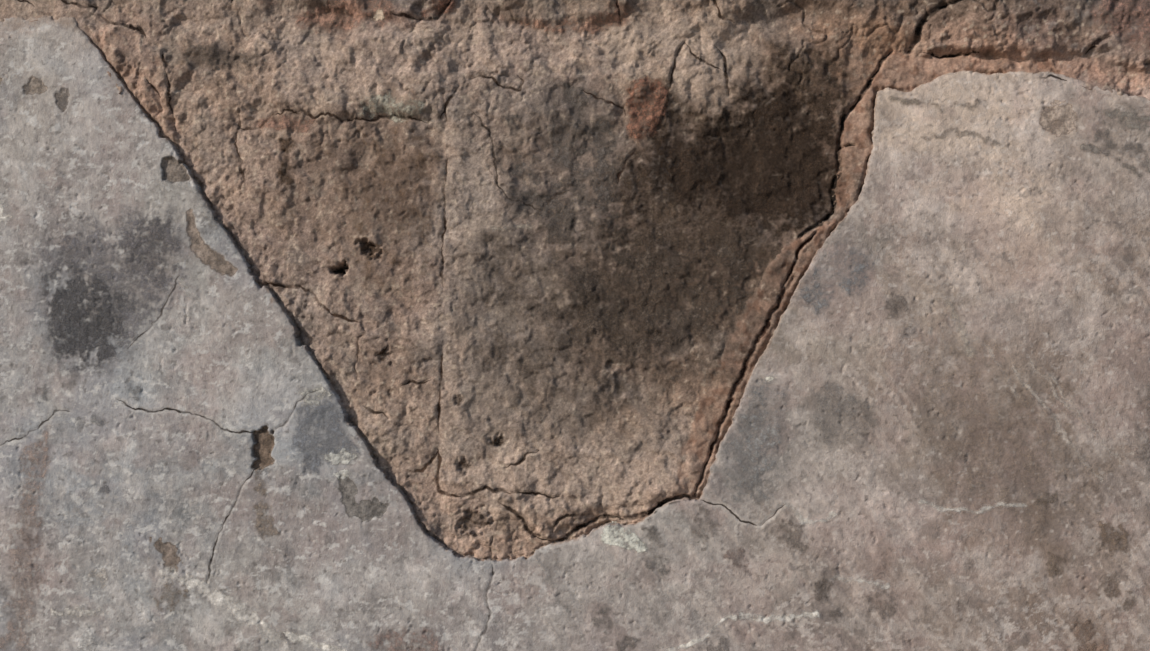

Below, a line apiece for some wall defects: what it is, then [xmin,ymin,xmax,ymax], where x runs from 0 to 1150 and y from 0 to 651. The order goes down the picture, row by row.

flaking render [1093,0,1150,48]
flaking render [23,76,70,112]
crack [234,74,569,211]
flaking render [78,0,1058,561]
crack [401,0,979,541]
crack [267,282,388,360]
crack [2,410,66,445]
crack [117,399,253,434]
crack [208,467,259,578]
crack [919,500,1026,513]